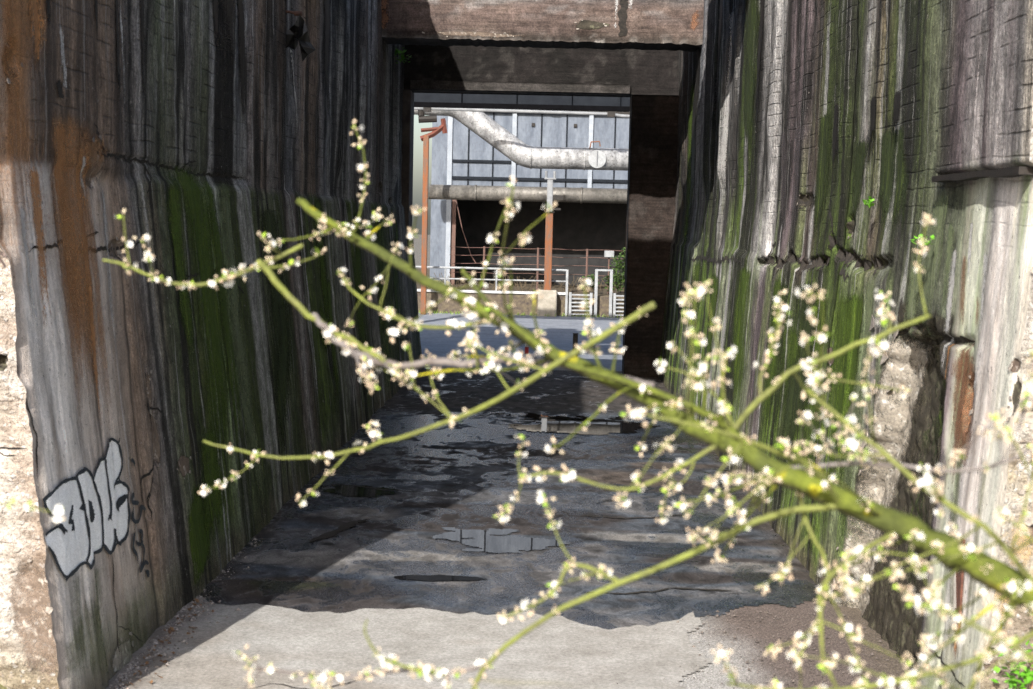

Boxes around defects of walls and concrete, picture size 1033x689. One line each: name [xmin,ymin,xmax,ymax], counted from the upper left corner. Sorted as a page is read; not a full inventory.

spalling [0,354,8,371]
crack [0,400,38,478]
rust [29,124,100,410]
leakage [164,164,265,512]
leakage [260,175,334,451]
leakage [344,210,401,386]
leakage [680,0,874,490]
rust [945,343,975,468]
crack [925,640,965,688]
rust [954,572,964,657]